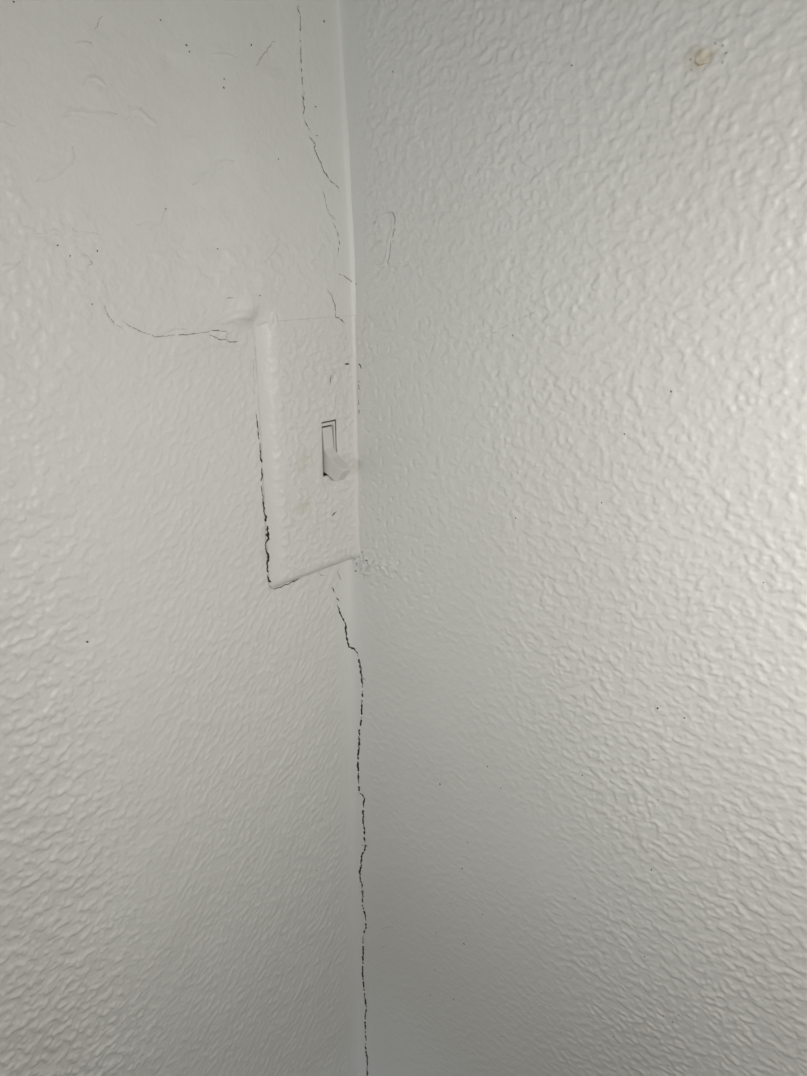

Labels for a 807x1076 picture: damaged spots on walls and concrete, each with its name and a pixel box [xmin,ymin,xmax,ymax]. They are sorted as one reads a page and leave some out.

crack [105,308,254,389]
crack [256,415,368,1075]